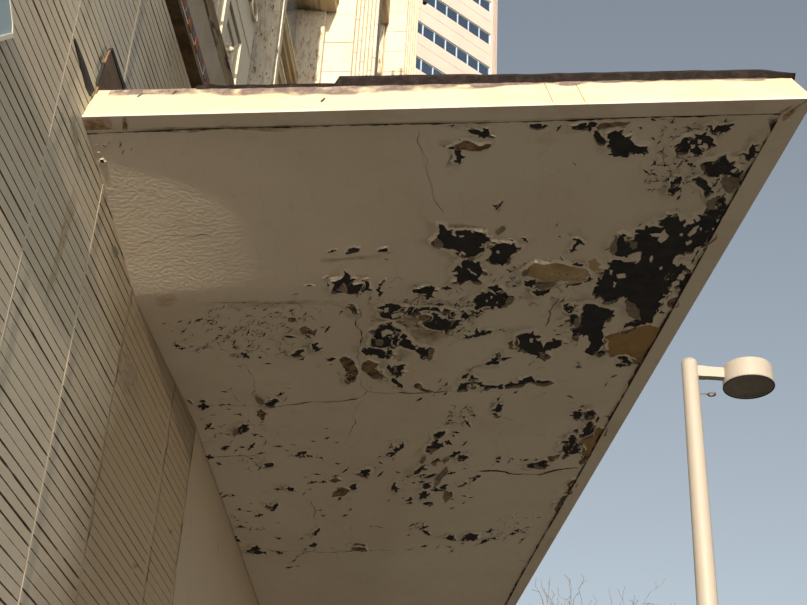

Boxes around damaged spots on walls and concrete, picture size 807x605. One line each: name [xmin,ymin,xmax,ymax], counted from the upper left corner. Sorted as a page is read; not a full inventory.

crack [87,118,451,216]
peeling [162,117,763,418]
crack [476,101,806,604]
peeling [185,387,483,509]
crack [340,390,447,443]
flaking render [492,395,611,470]
peeling [231,501,284,555]
peeling [405,515,541,553]